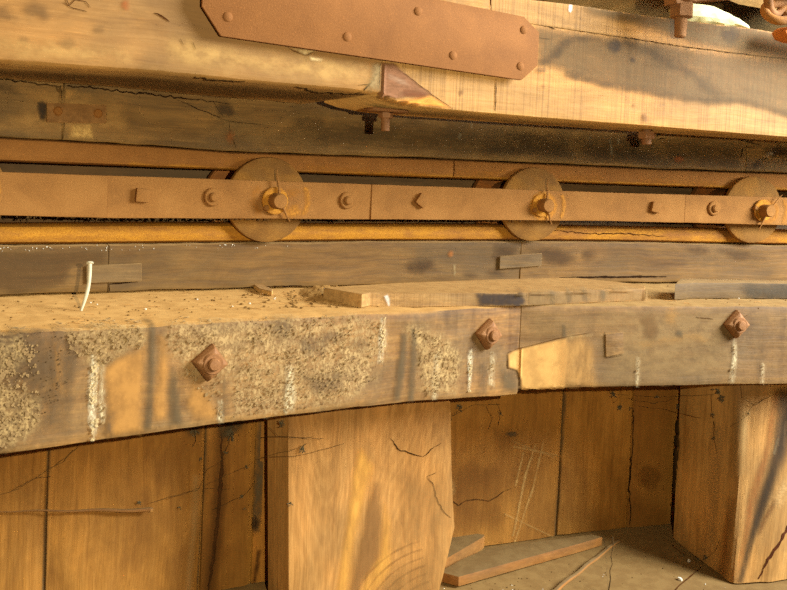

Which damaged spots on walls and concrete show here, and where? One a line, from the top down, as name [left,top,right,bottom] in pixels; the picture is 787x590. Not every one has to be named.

crack [2,76,262,146]
crack [294,62,453,109]
rust [530,192,566,220]
damp [89,362,111,441]
crack [207,433,224,590]
crack [429,473,509,517]
crack [627,410,635,525]
damp [750,392,787,535]
crack [758,527,787,579]